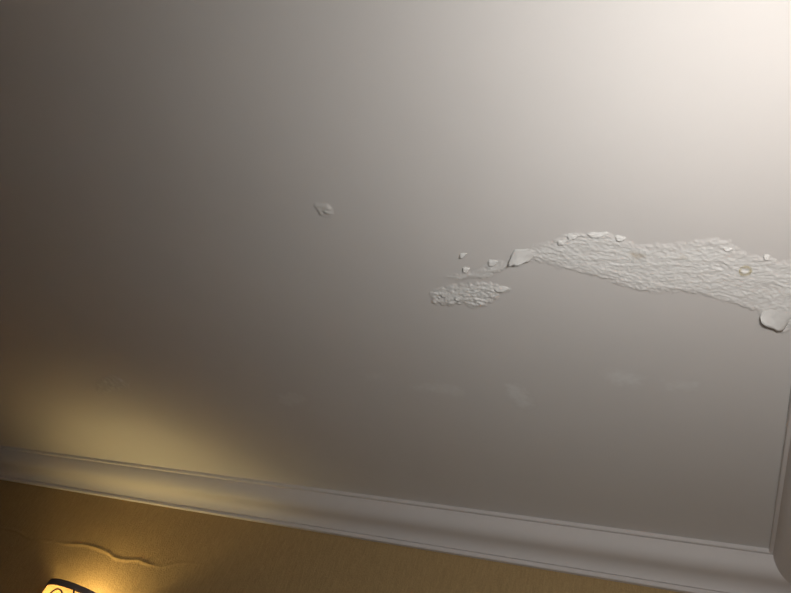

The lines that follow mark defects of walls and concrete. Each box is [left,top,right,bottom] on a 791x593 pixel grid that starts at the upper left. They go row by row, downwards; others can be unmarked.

flaking render [426,229,791,336]